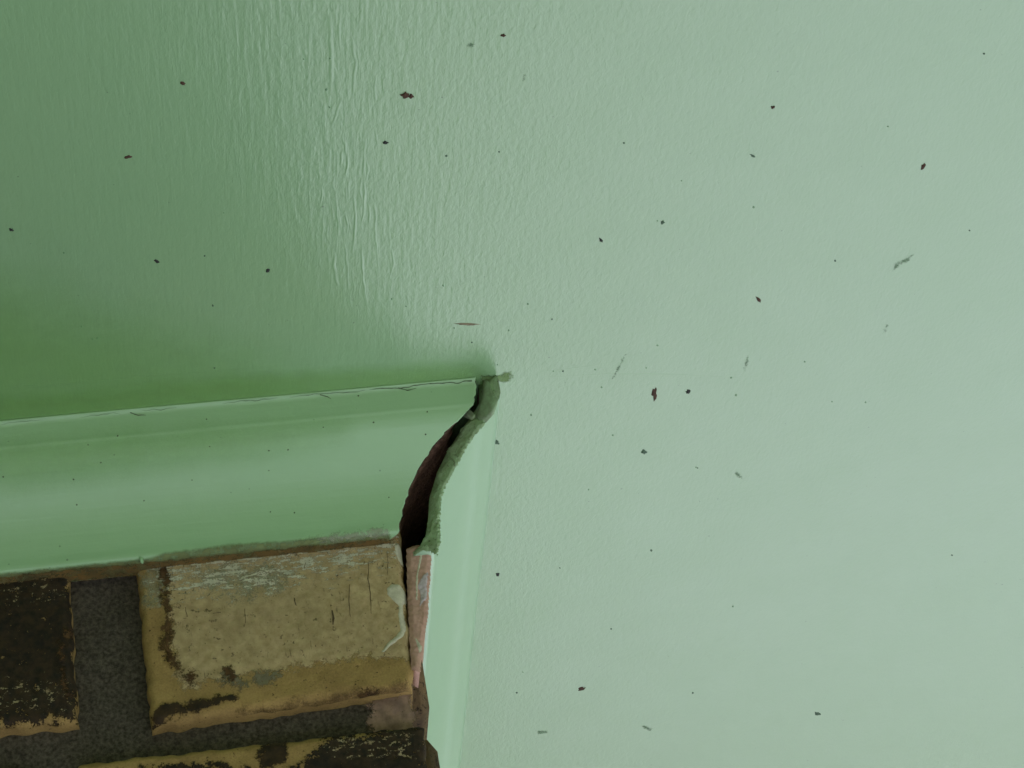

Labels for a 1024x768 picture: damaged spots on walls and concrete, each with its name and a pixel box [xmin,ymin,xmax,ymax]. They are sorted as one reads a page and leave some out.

leakage [0,578,79,729]
leakage [158,566,199,686]